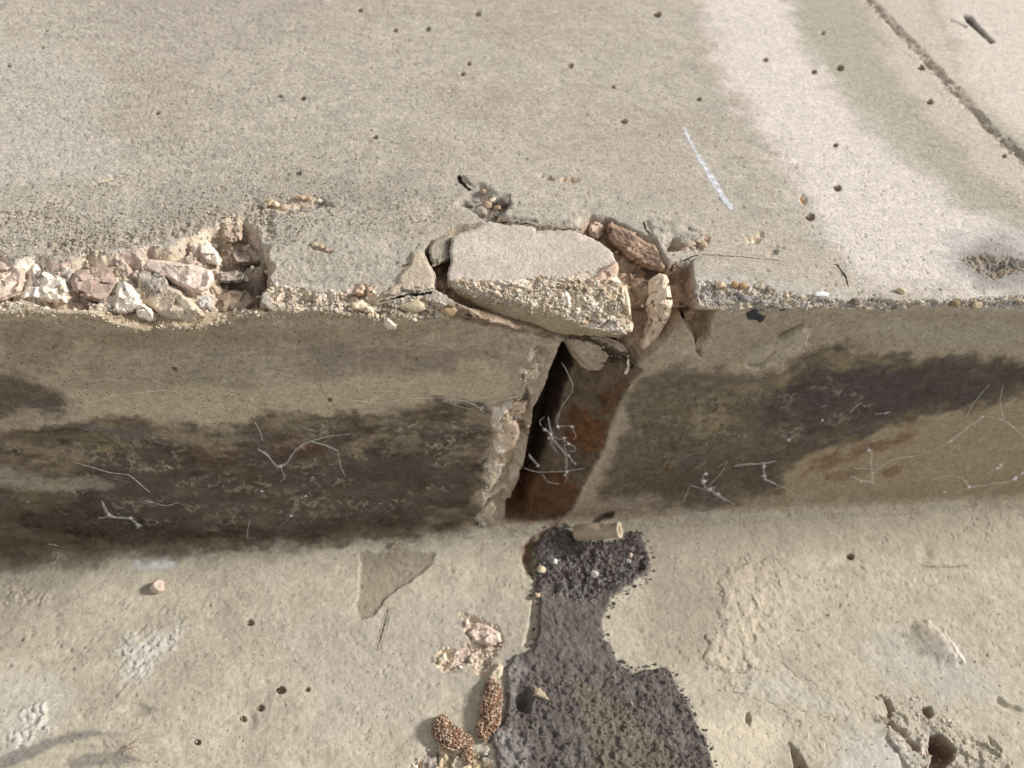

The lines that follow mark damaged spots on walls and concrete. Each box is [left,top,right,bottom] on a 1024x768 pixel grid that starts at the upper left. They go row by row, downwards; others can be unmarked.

water stain [0,377,64,414]
water stain [0,397,491,570]
spalling [0,188,1024,527]
corrosion [504,335,645,523]
water stain [600,346,1024,506]